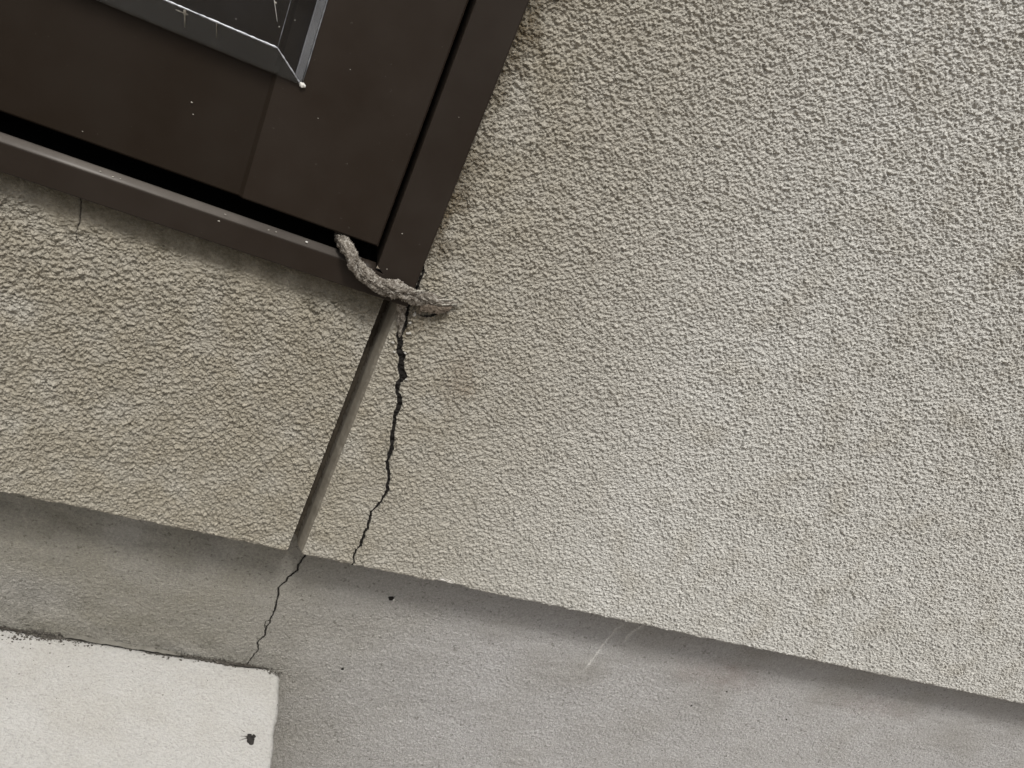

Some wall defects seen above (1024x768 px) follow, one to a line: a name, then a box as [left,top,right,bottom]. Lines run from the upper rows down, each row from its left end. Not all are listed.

crack [351,266,438,565]
crack [0,626,108,645]
crack [157,555,306,669]